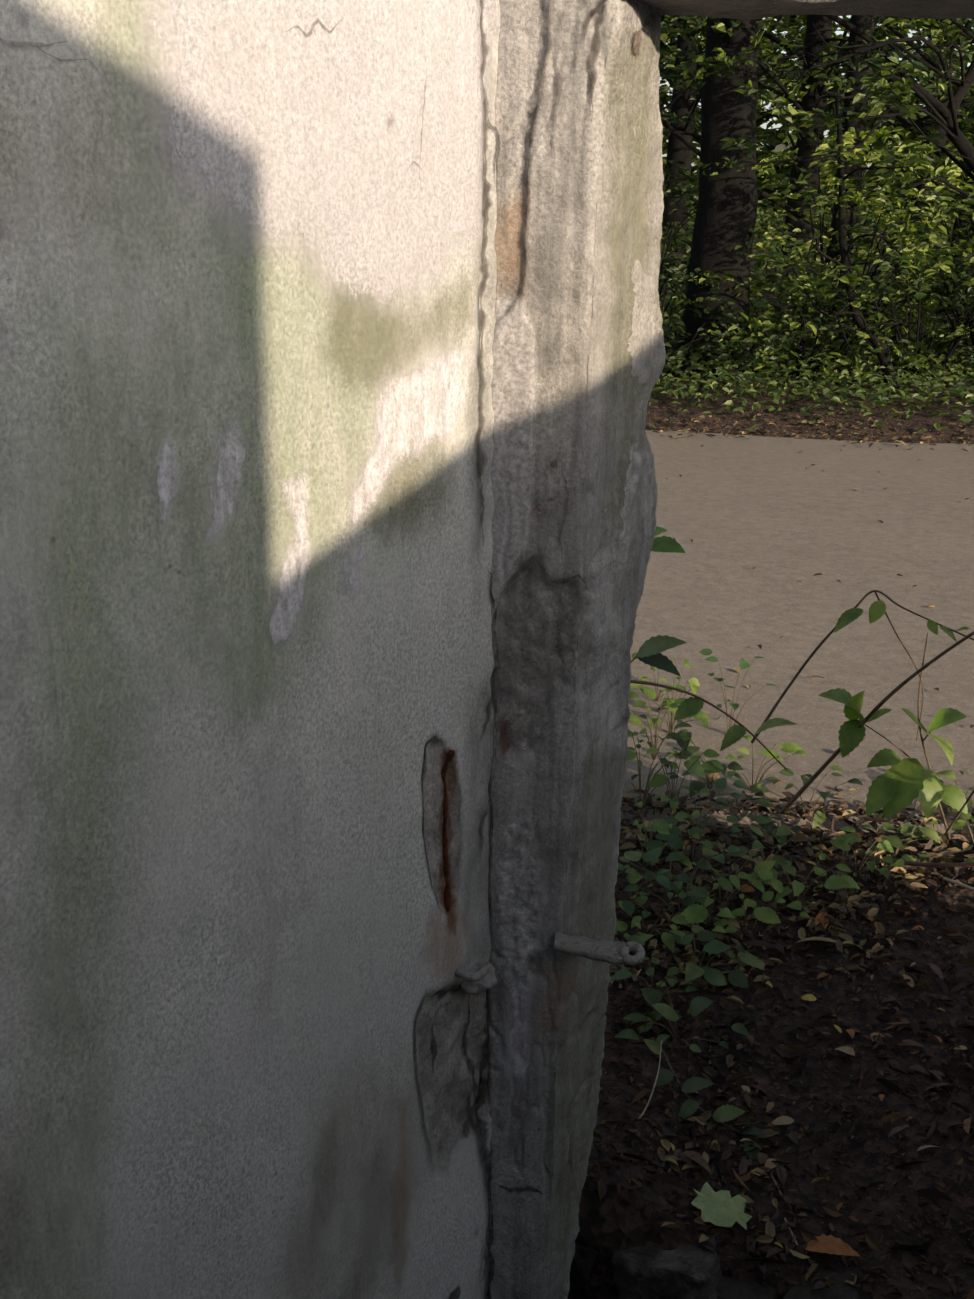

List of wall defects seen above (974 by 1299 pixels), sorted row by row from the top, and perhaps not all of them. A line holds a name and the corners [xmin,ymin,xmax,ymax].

crack [477,0,607,943]
spalling [421,736,462,931]
crack [463,990,547,1299]